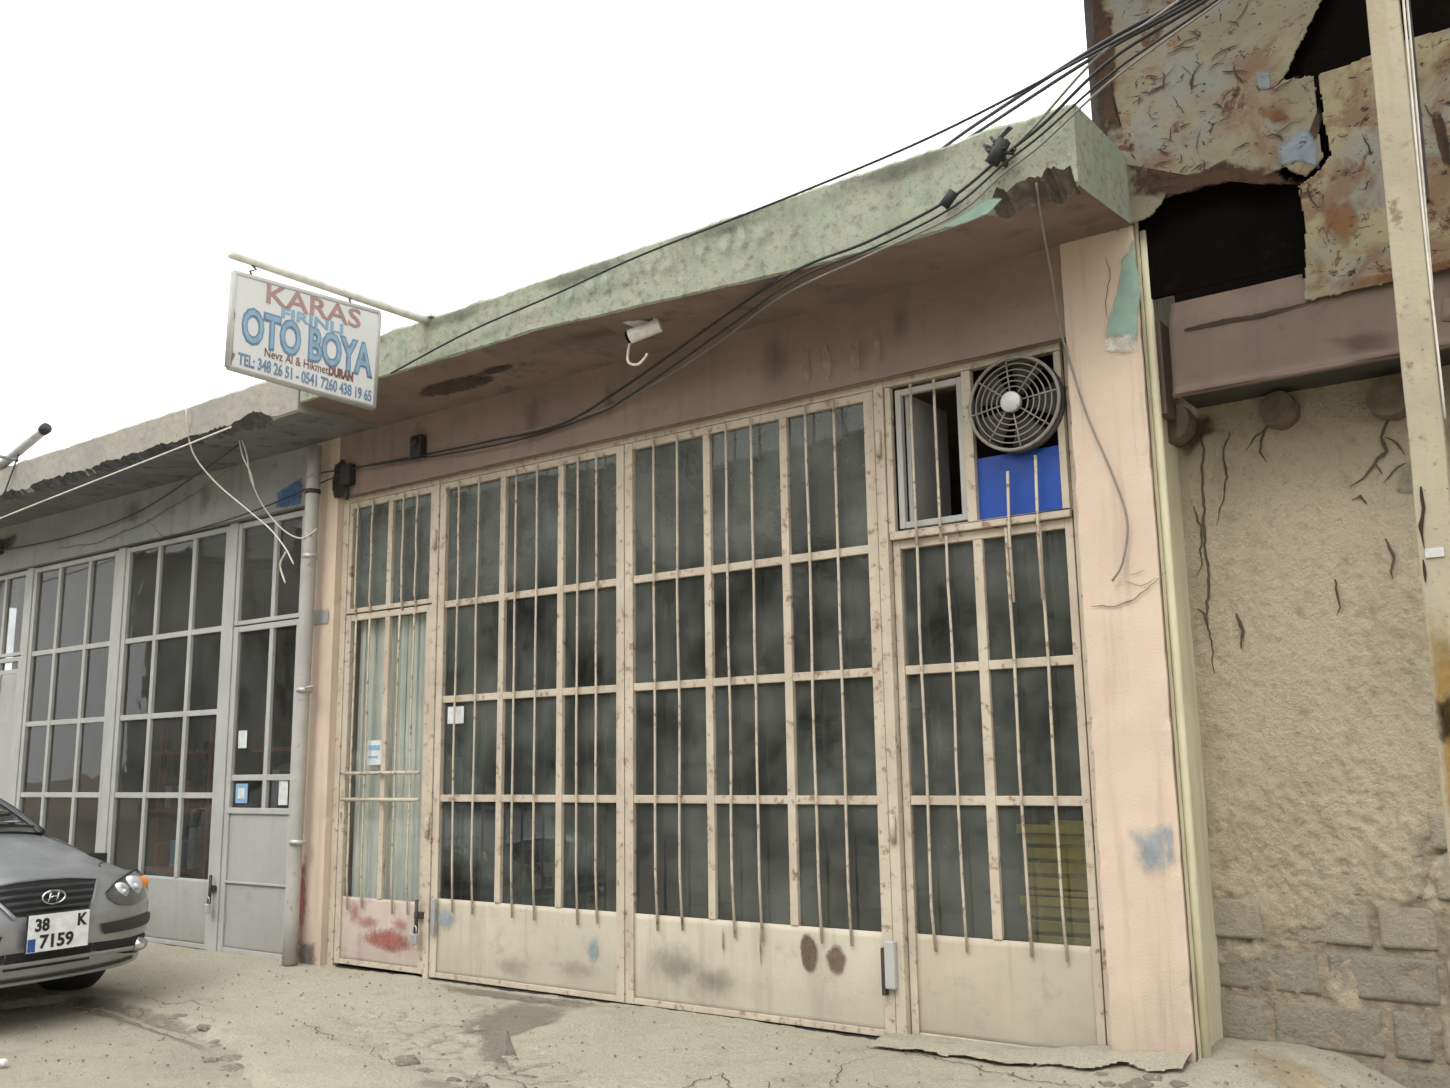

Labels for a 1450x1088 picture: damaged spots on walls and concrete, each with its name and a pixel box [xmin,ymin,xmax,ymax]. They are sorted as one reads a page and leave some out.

rust [1093,0,1393,301]
rust [1404,28,1450,272]
crack [1349,420,1427,583]
crack [1333,579,1341,616]
rust [1433,642,1450,802]
water stain [800,934,845,973]
flaking render [1213,812,1450,1088]
crack [903,1050,1079,1086]